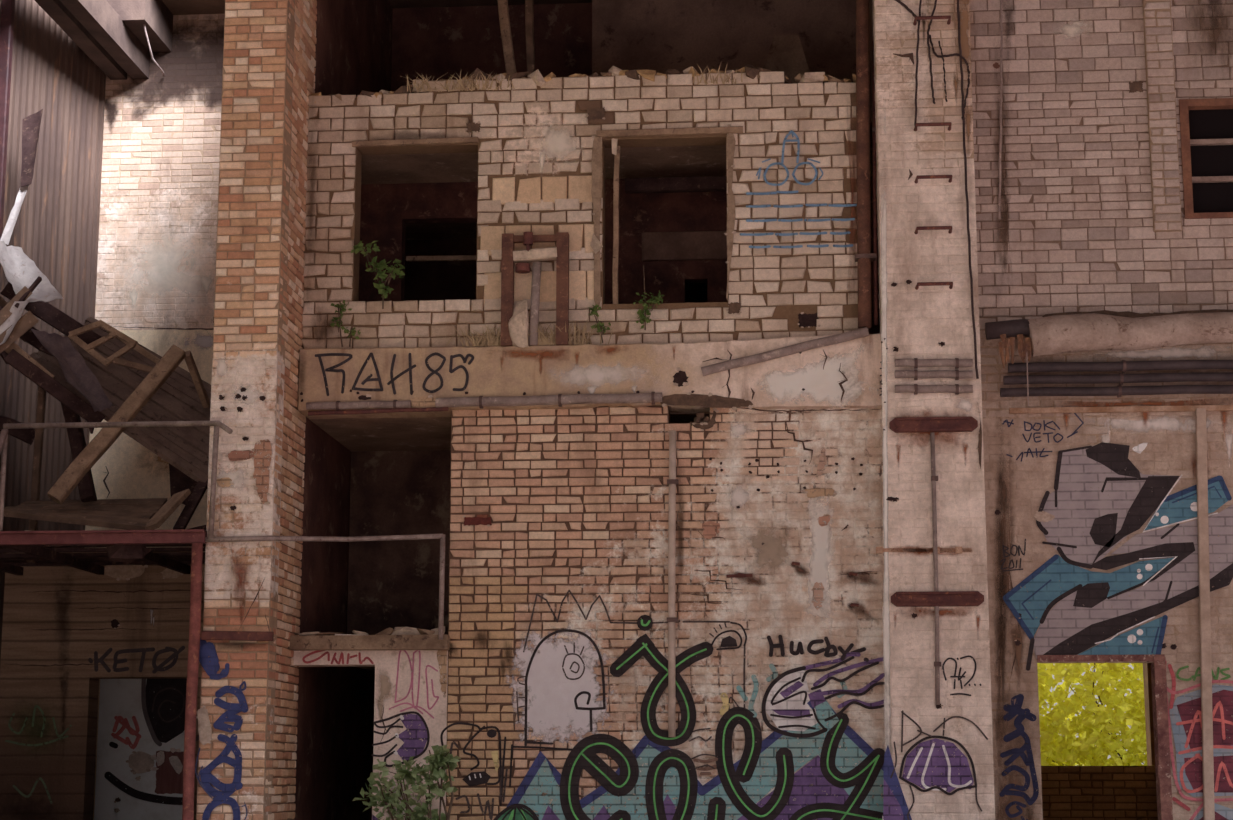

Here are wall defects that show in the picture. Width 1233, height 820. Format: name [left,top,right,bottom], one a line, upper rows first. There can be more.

leakage [105,100,117,125]
spalling [219,387,266,412]
peeling [225,436,272,505]
peeling [801,448,837,616]